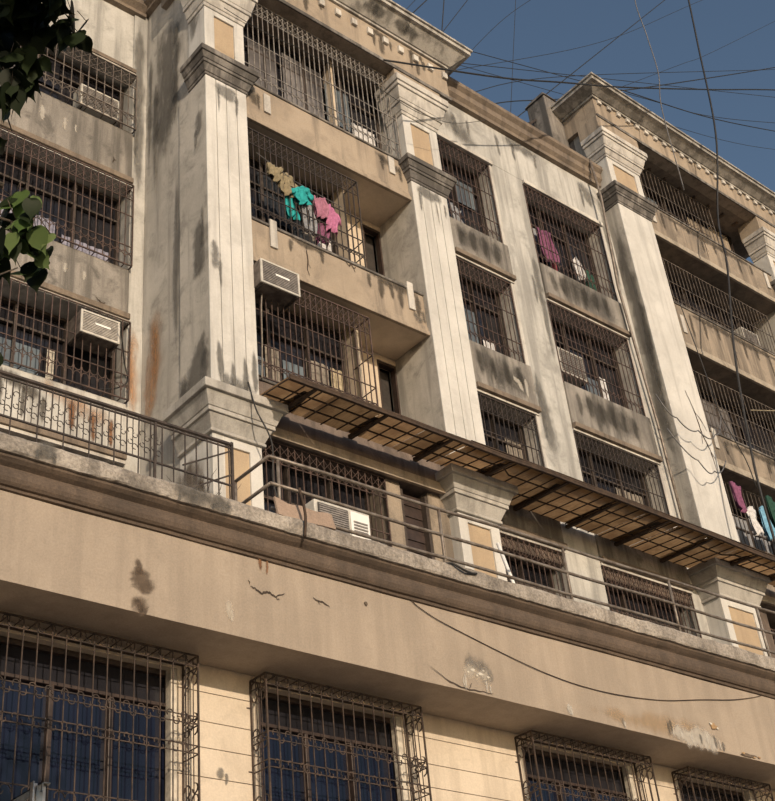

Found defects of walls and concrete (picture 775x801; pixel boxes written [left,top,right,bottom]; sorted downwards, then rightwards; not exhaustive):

leakage [135,27,178,185]
rust [149,323,158,409]
leakage [132,560,153,615]
crack [248,580,284,599]
peeling [667,721,725,751]